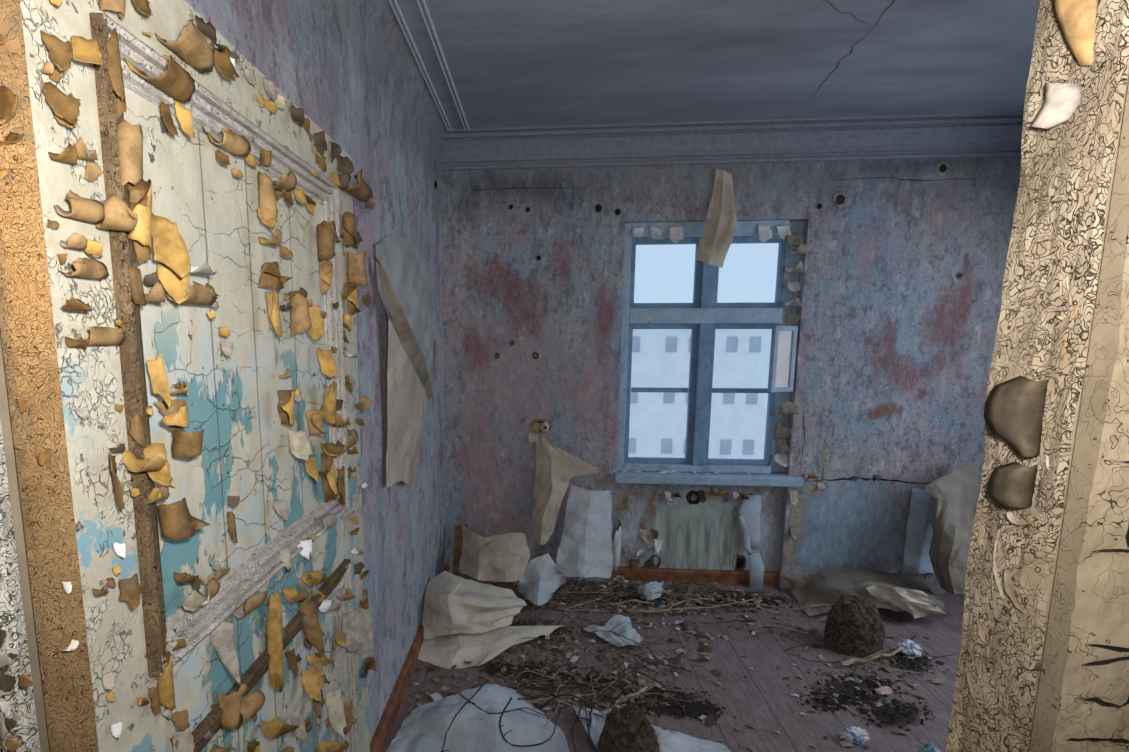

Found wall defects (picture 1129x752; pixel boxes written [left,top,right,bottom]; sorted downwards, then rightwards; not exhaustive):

crack [811,0,895,98]
peeling [1053,0,1096,66]
peeling [1030,82,1081,129]
peeling [40,0,377,752]
crack [1091,529,1129,552]
crack [1082,644,1129,665]
peeling [0,629,33,752]
crack [1078,697,1129,708]
crack [1066,736,1129,744]